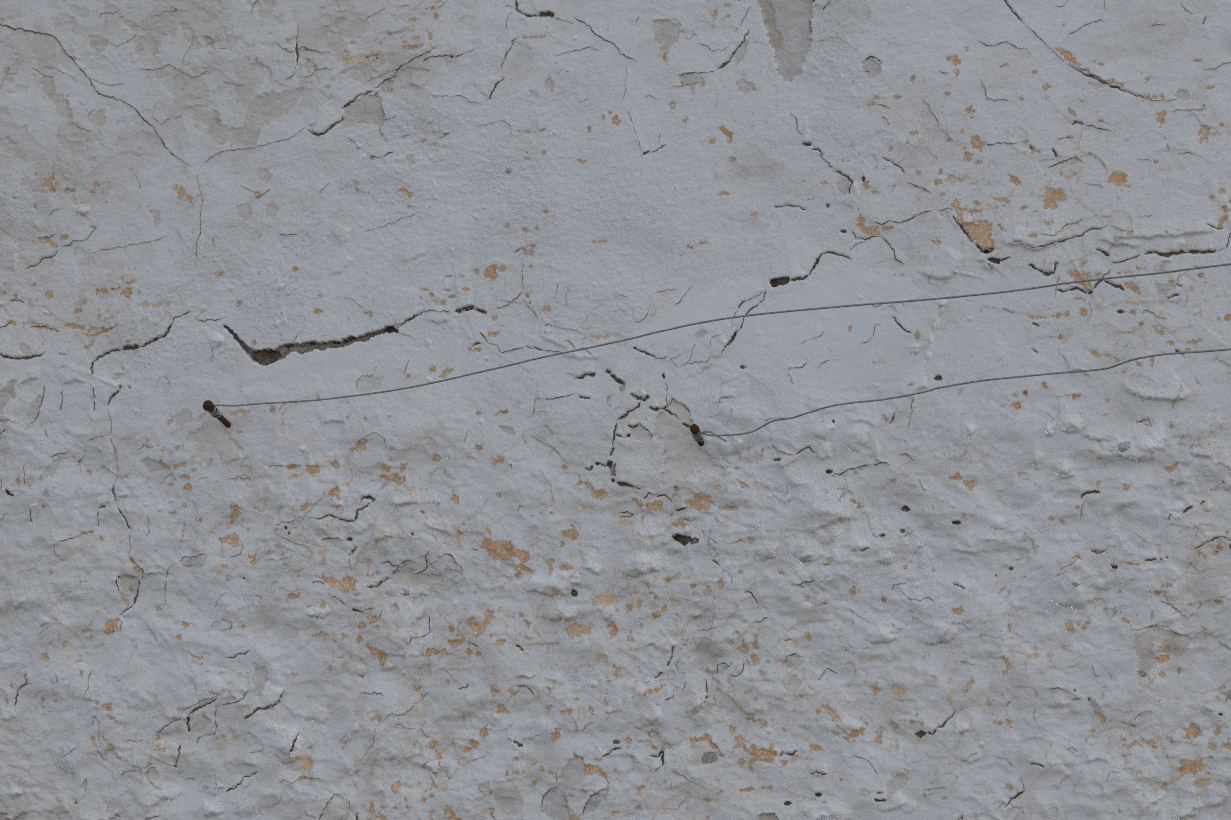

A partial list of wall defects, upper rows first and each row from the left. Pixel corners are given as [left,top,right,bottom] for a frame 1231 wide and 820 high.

crack [431,2,751,155]
peeling [756,0,813,82]
crack [980,0,1205,112]
crack [791,114,853,193]
spalling [224,325,399,366]
peeling [629,237,930,364]
peeling [170,409,244,465]
peeling [627,397,726,487]
crack [356,158,1231,700]
crack [277,490,478,619]
spalling [673,534,699,546]
peeling [914,695,953,738]